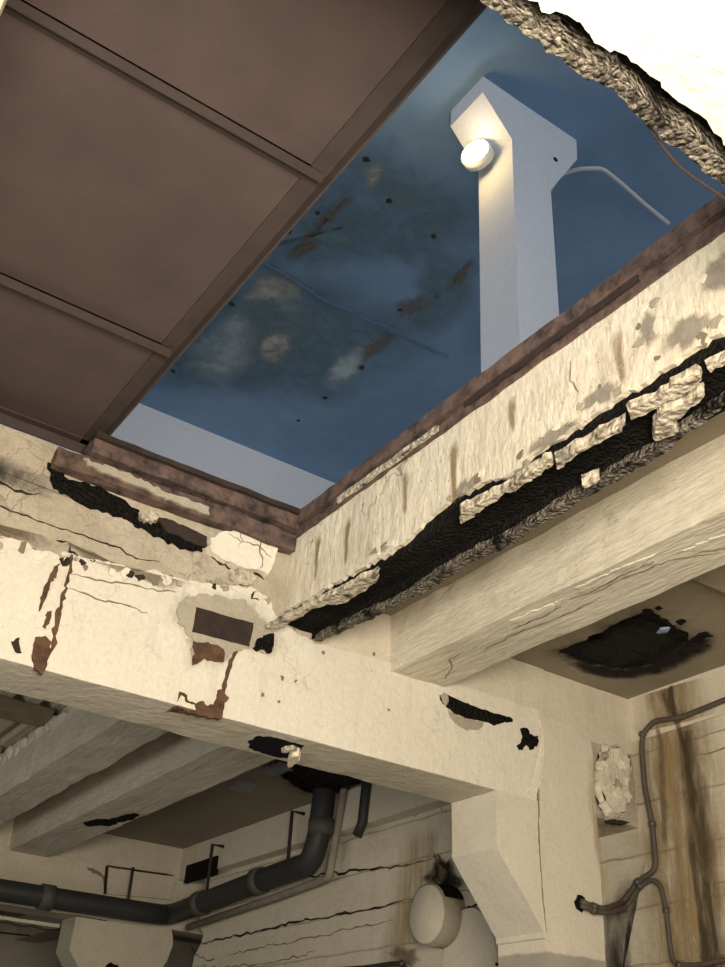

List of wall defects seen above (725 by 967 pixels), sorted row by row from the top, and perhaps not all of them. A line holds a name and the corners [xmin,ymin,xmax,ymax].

peeling [668,313,724,348]
water stain [0,525,22,538]
water stain [0,462,23,482]
spalling [47,462,207,552]
spalling [315,383,725,655]
corrosion [11,544,73,675]
spalling [108,567,275,721]
spalling [248,736,304,775]
spalling [439,693,545,794]
spalling [594,743,633,826]
water stain [646,682,723,967]
water stain [607,905,636,967]